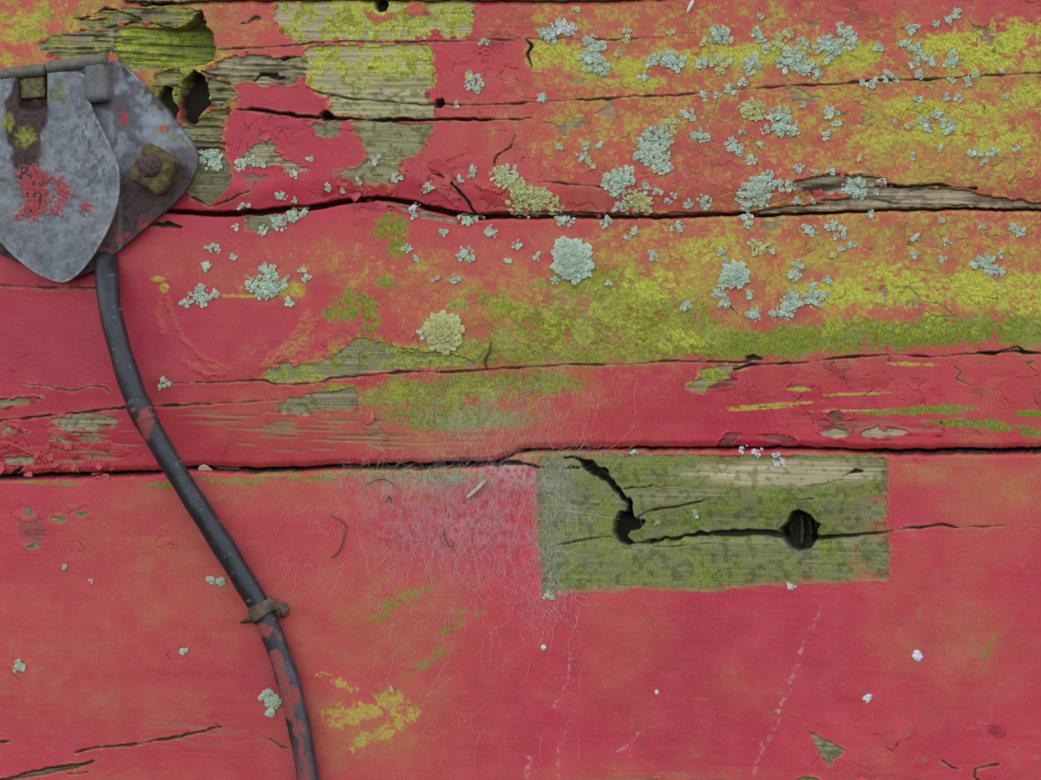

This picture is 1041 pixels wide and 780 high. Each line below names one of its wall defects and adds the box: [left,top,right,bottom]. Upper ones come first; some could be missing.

peeling [38,7,181,60]
peeling [270,0,477,186]
peeling [185,133,309,206]
crack [430,172,480,215]
crack [870,183,979,209]
crack [154,346,1041,408]
peeling [48,410,119,444]
peeling [816,409,914,442]
crack [491,456,786,549]
crack [812,523,1006,541]
crack [0,726,224,780]
peeling [810,733,844,765]